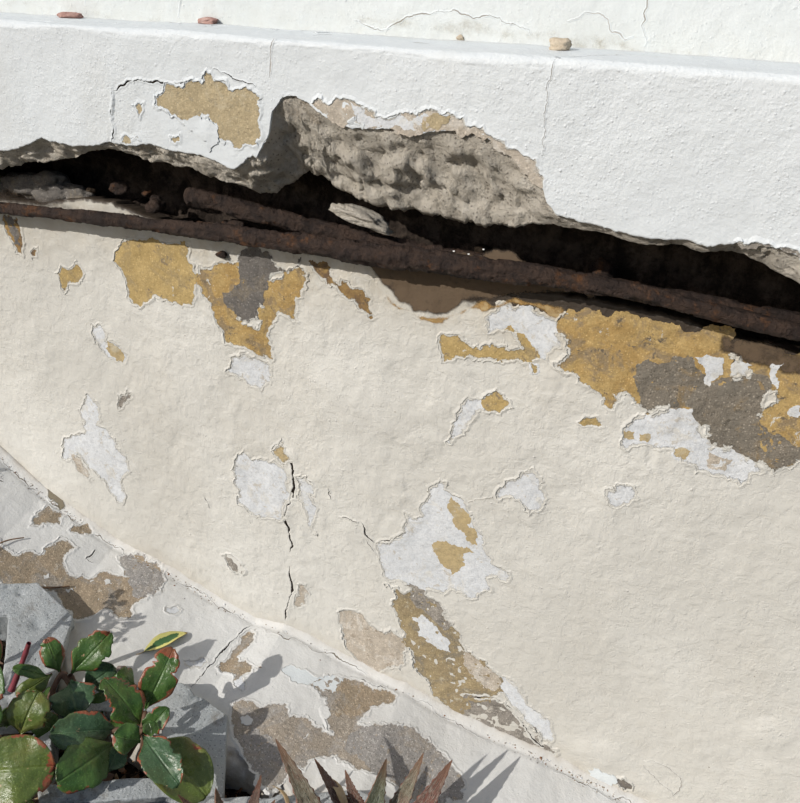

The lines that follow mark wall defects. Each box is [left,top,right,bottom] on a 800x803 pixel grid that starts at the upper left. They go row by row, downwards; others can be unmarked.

crack [108,76,183,144]
crack [210,8,532,87]
crack [540,0,650,157]
spalling [0,67,800,312]
peeling [111,234,380,393]
crack [0,456,78,524]
peeling [0,504,169,623]
peeling [231,437,320,537]
crack [84,437,494,744]
spalling [335,477,561,758]
peeling [180,628,469,803]
crack [462,678,555,751]